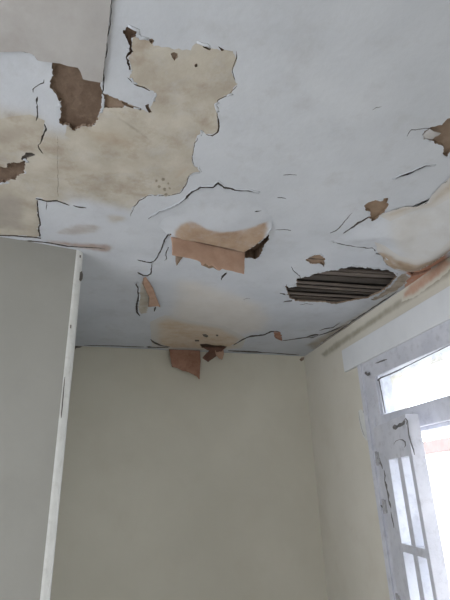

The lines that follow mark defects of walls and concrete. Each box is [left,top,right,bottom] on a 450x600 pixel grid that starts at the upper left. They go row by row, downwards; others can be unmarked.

water stain [24,117,159,178]
peeling [0,24,237,237]
flaking render [423,118,450,158]
crack [150,181,260,218]
flaking render [331,198,389,233]
crack [137,234,170,276]
peeling [134,277,160,317]
flaking render [280,254,414,305]